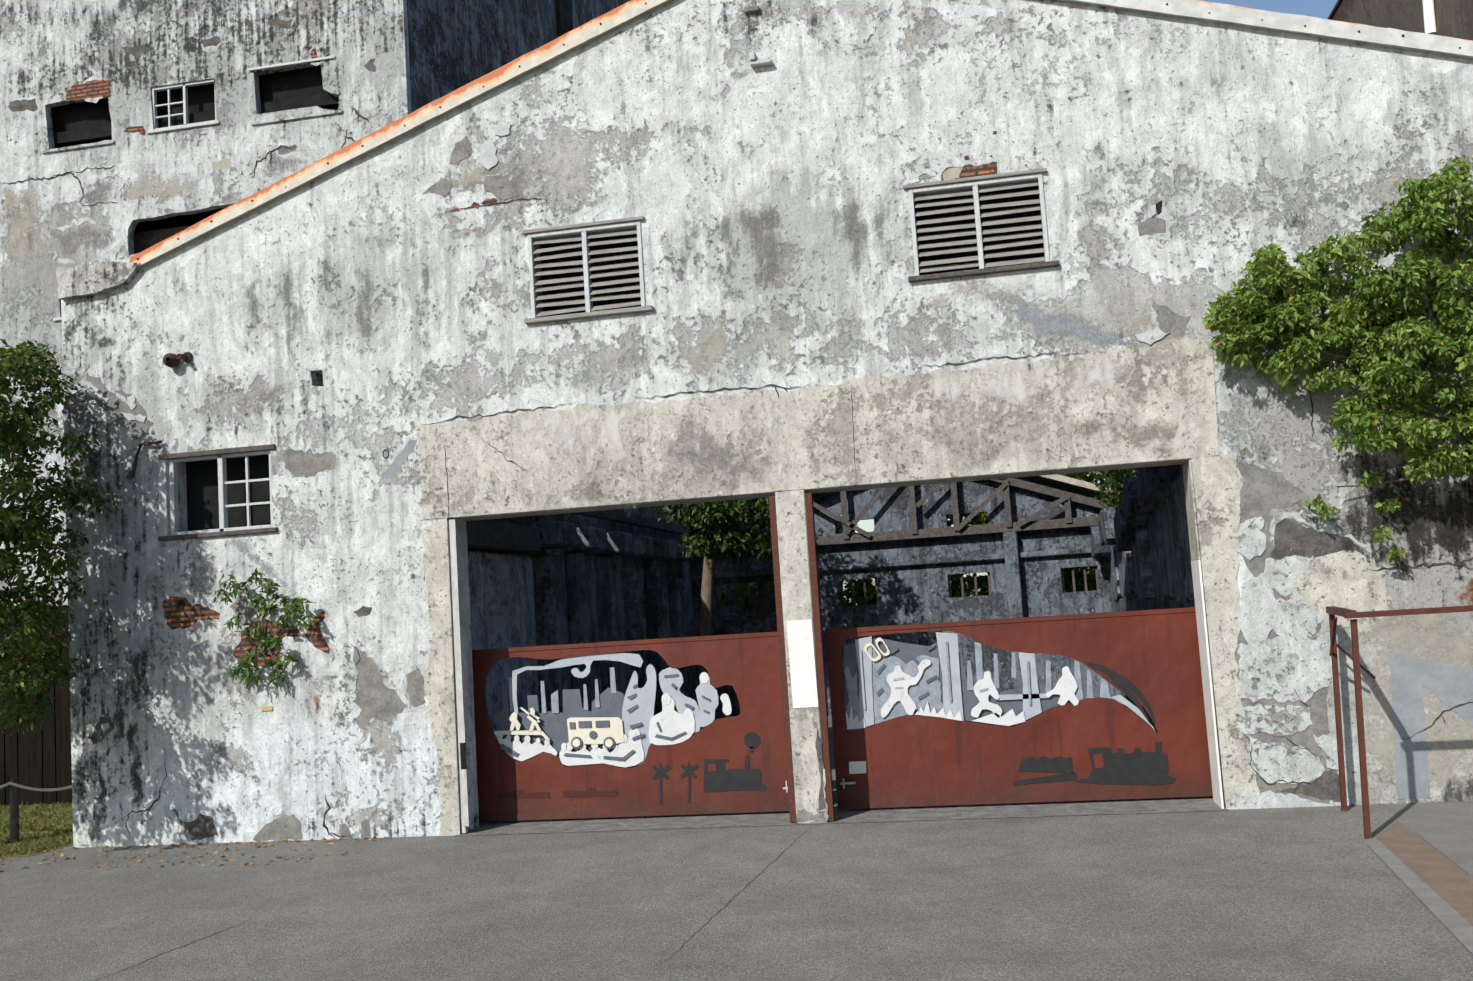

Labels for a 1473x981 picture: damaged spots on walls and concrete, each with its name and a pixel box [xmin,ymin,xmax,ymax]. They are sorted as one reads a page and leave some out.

damp [0,0,227,42]
peeling [423,124,524,201]
crack [636,383,811,398]
crack [913,352,1088,369]
damp [1338,452,1473,574]
flaking render [160,592,429,730]
peeling [1233,459,1382,809]
damp [1355,603,1473,805]
crack [1400,702,1473,740]
damp [126,724,144,806]
flaking render [170,809,219,844]
flaking render [253,812,304,842]